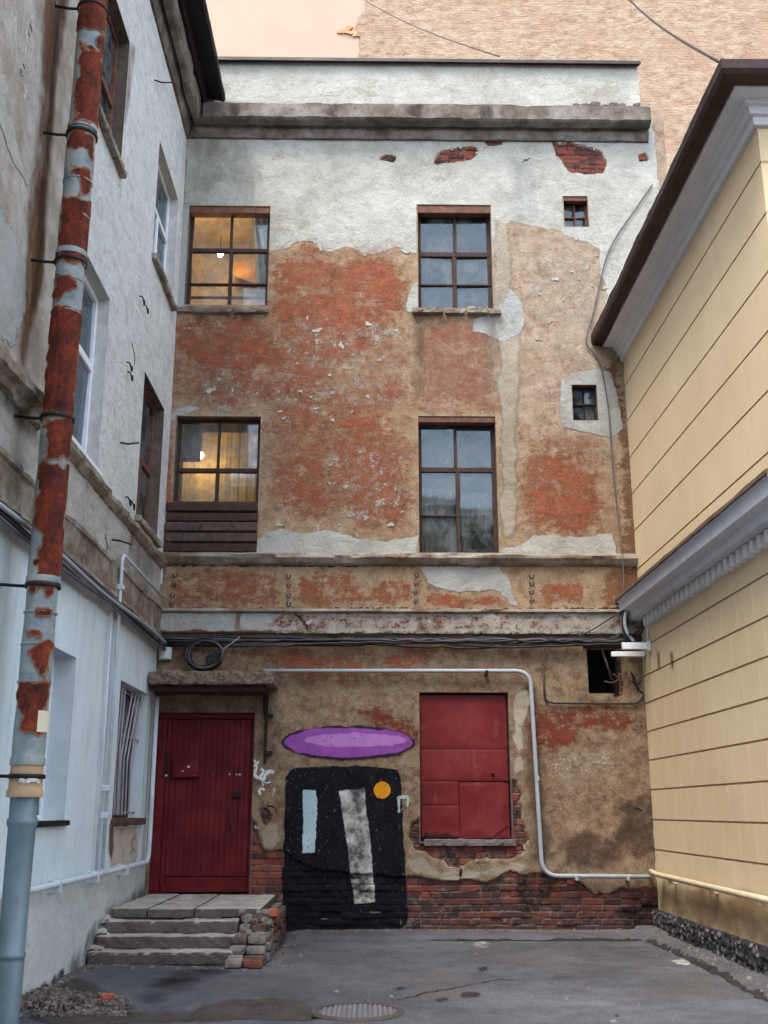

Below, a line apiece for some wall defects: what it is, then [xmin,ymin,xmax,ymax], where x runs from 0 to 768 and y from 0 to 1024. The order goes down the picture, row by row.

rust [16,0,108,737]
flaking render [173,119,660,554]
peeling [171,566,642,687]
spalling [250,781,659,933]
damp [566,833,616,867]